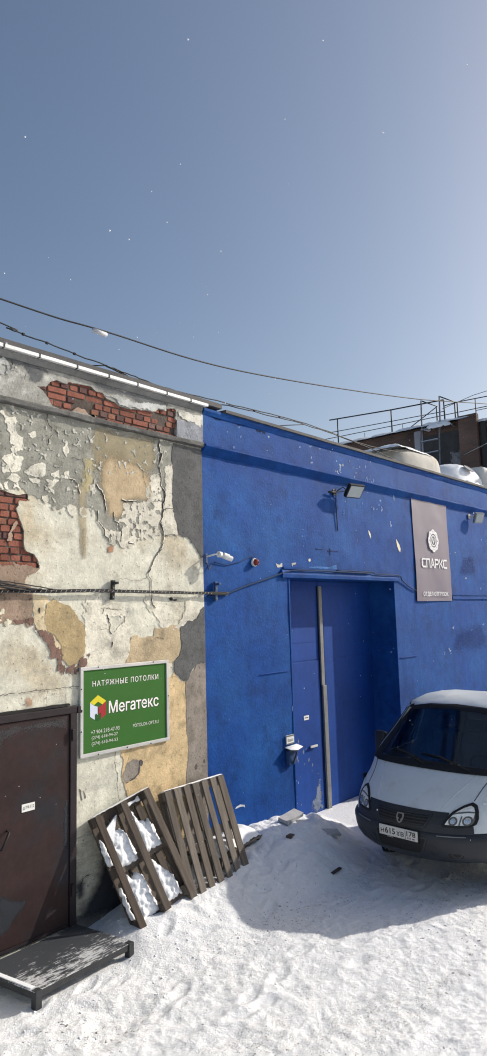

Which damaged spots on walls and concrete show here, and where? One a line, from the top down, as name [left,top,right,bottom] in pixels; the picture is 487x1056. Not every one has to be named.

peeling [0,357,17,375]
crack [69,441,173,608]
flaking render [0,381,205,853]